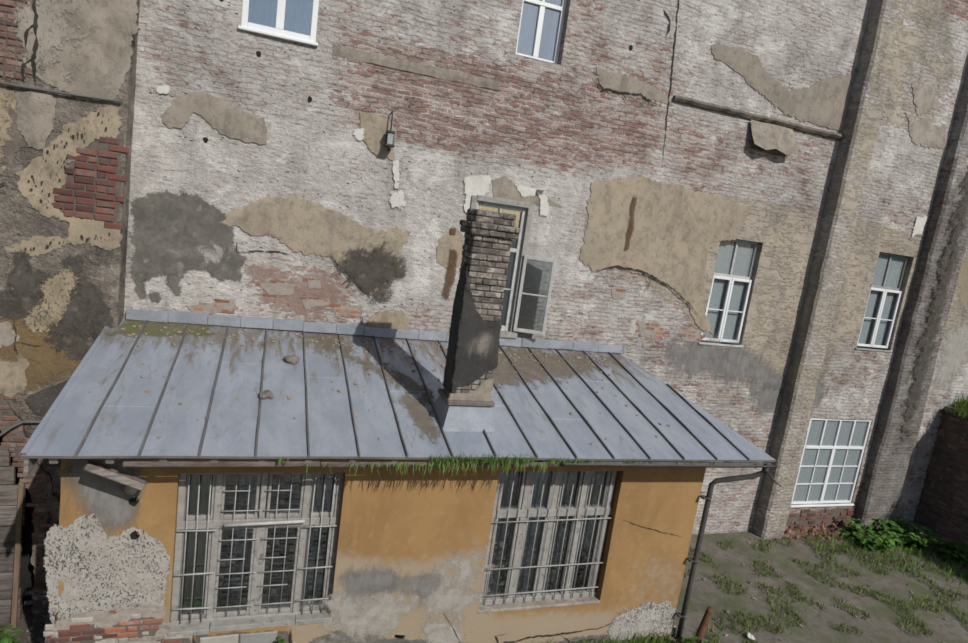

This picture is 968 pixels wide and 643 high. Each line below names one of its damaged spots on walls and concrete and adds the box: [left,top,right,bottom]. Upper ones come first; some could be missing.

spalling [0,0,34,81]
crack [596,0,680,163]
spalling [53,133,129,230]
water stain [0,251,116,361]
water stain [130,190,246,303]
spalling [256,278,362,318]
flaking render [220,194,412,296]
spalling [635,320,664,339]
flaking render [579,175,750,335]
water stain [896,172,968,453]
peeling [0,394,192,643]
crack [495,618,625,643]